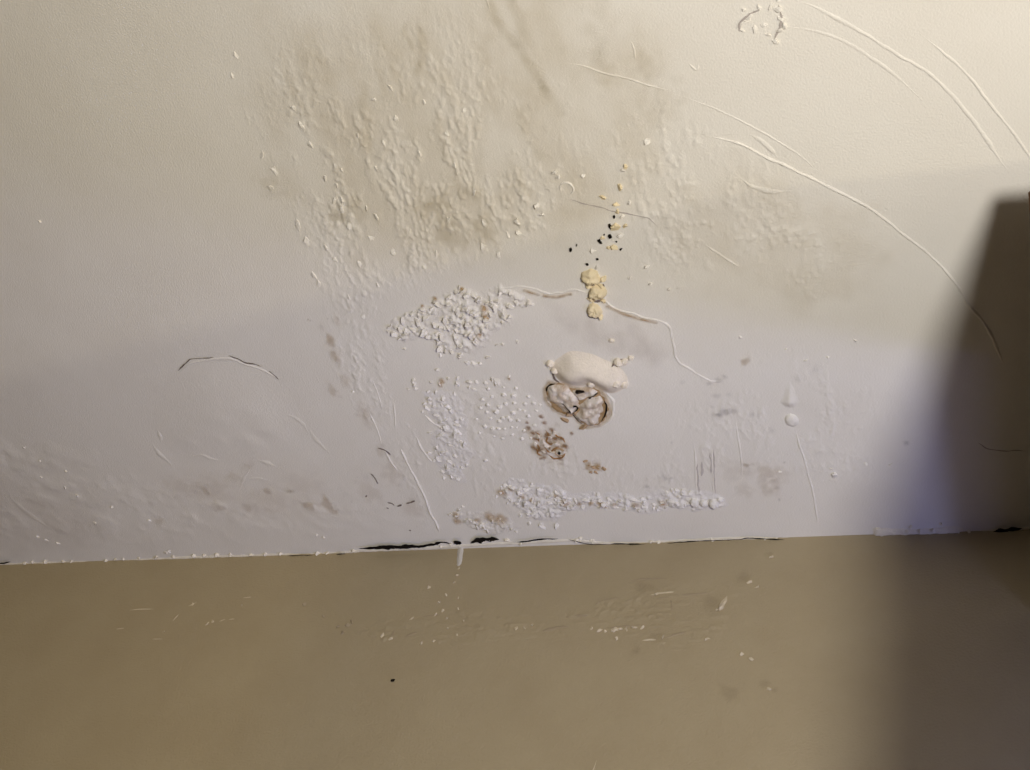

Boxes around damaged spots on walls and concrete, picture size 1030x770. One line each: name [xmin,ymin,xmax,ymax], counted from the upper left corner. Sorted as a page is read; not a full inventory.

spalling [736,0,786,44]
spalling [586,164,631,270]
crack [178,356,282,379]
peeling [387,283,536,483]
flaking render [546,383,615,430]
crack [0,530,787,565]
peeling [448,477,729,536]
crack [872,522,1030,536]